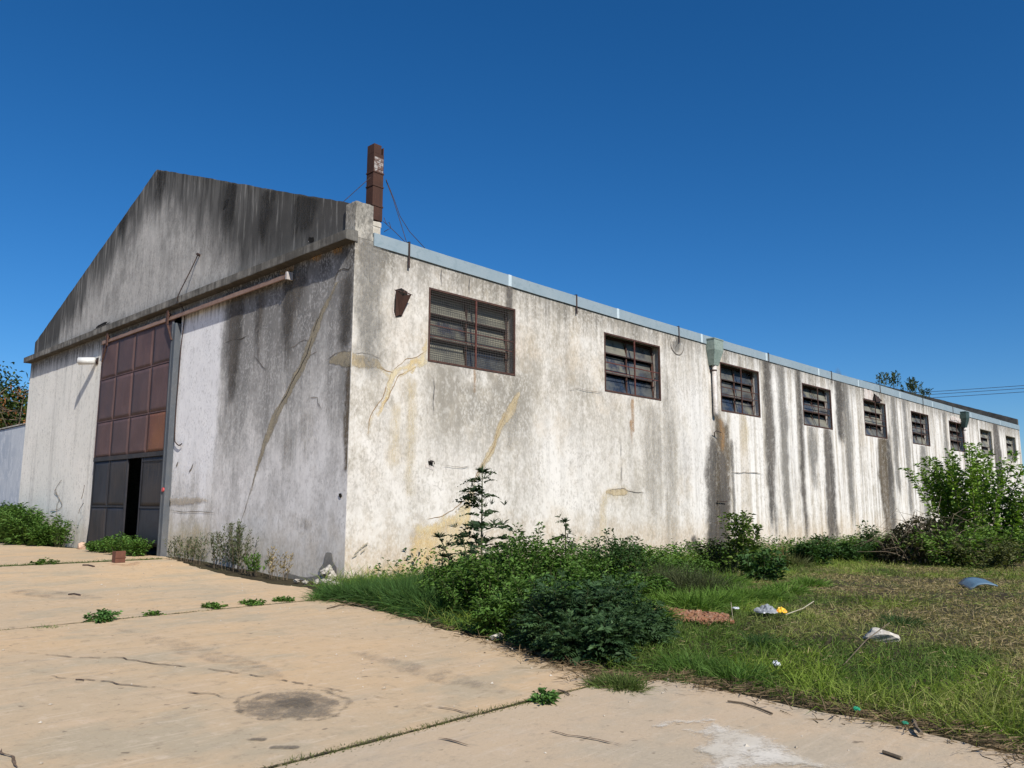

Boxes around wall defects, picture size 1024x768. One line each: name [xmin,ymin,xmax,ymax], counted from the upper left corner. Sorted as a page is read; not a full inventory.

water stain [224,183,236,227]
water stain [228,296,243,397]
water stain [282,277,306,350]
crack [241,266,435,520]
crack [414,392,520,535]
water stain [689,415,736,552]
water stain [763,360,855,543]
water stain [878,396,930,537]
water stain [993,423,1003,497]